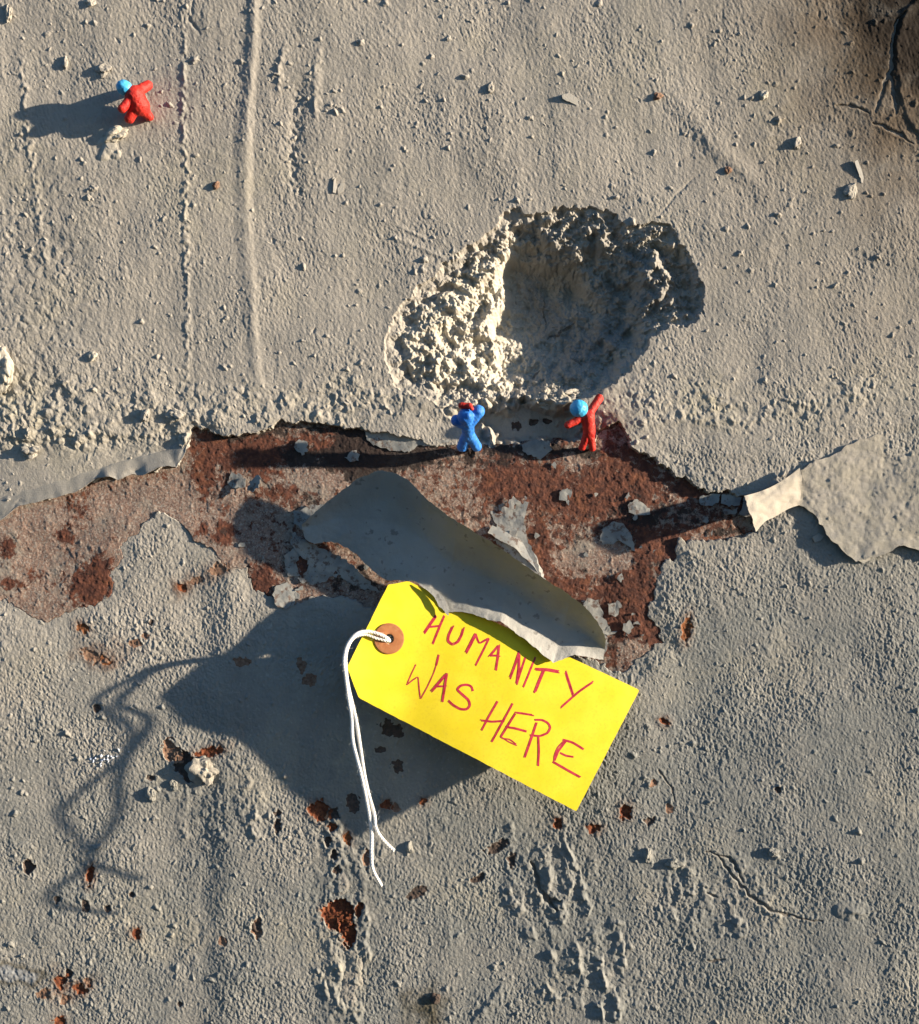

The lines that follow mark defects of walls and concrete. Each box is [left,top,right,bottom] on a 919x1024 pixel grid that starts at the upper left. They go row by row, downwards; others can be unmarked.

crack [836,19,914,144]
spalling [187,561,230,585]
corrosion [0,420,755,672]
peeling [302,470,606,663]
corrosion [190,745,223,761]
corrosion [307,798,352,846]
crack [705,851,823,922]
corrosion [320,898,364,949]
corrosion [54,973,92,995]